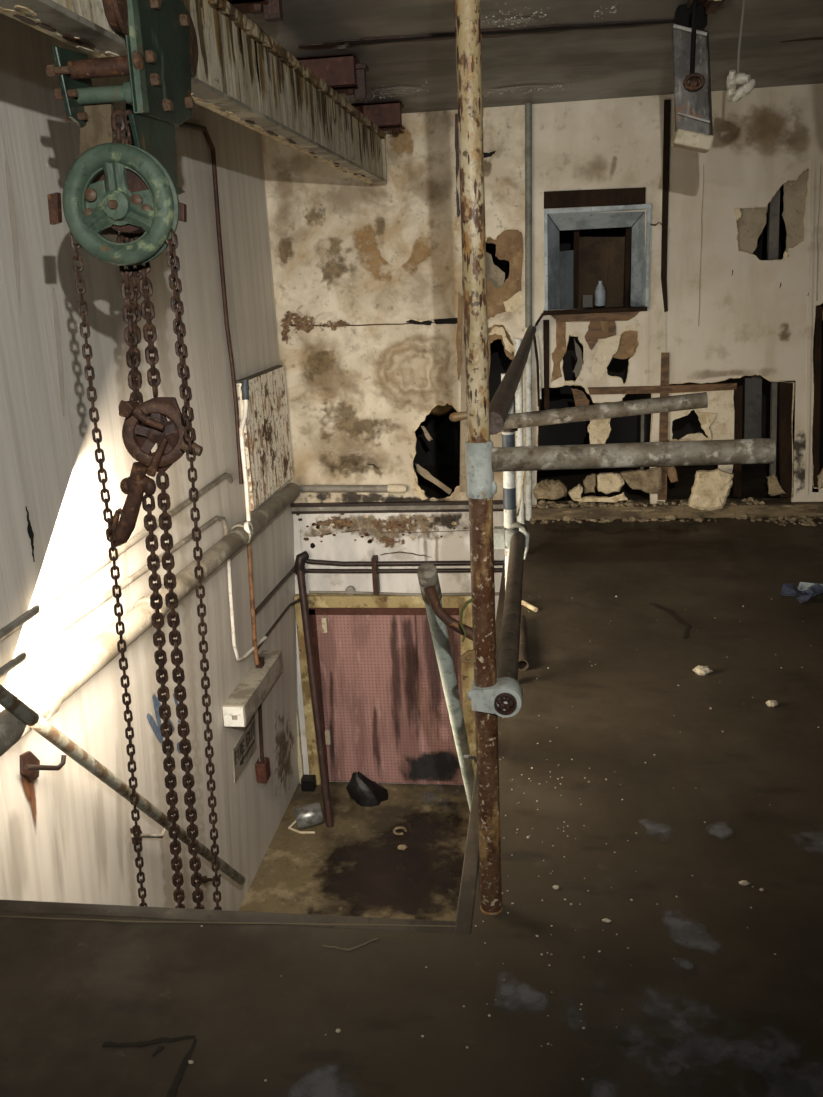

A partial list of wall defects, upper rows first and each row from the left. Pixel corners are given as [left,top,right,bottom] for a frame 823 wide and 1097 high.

leakage [392,128,413,154]
spalling [281,0,524,429]
spalling [735,168,809,261]
leakage [279,239,293,263]
leakage [322,218,391,282]
leakage [402,237,430,271]
peeling [549,320,640,407]
leakage [322,401,396,442]
spalling [588,418,611,444]
spalling [668,374,794,442]
leakage [321,455,381,477]
spalling [293,402,471,595]